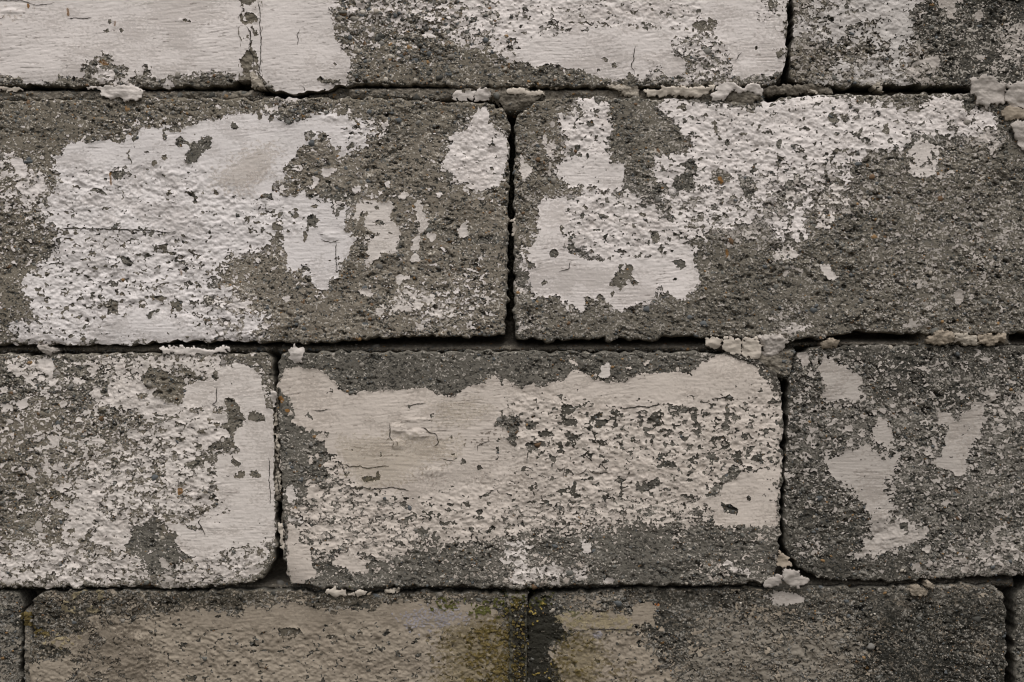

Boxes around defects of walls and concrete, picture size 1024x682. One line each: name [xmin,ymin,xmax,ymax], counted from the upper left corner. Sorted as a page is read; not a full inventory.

peeling [0,0,1024,368]
peeling [0,336,1024,682]